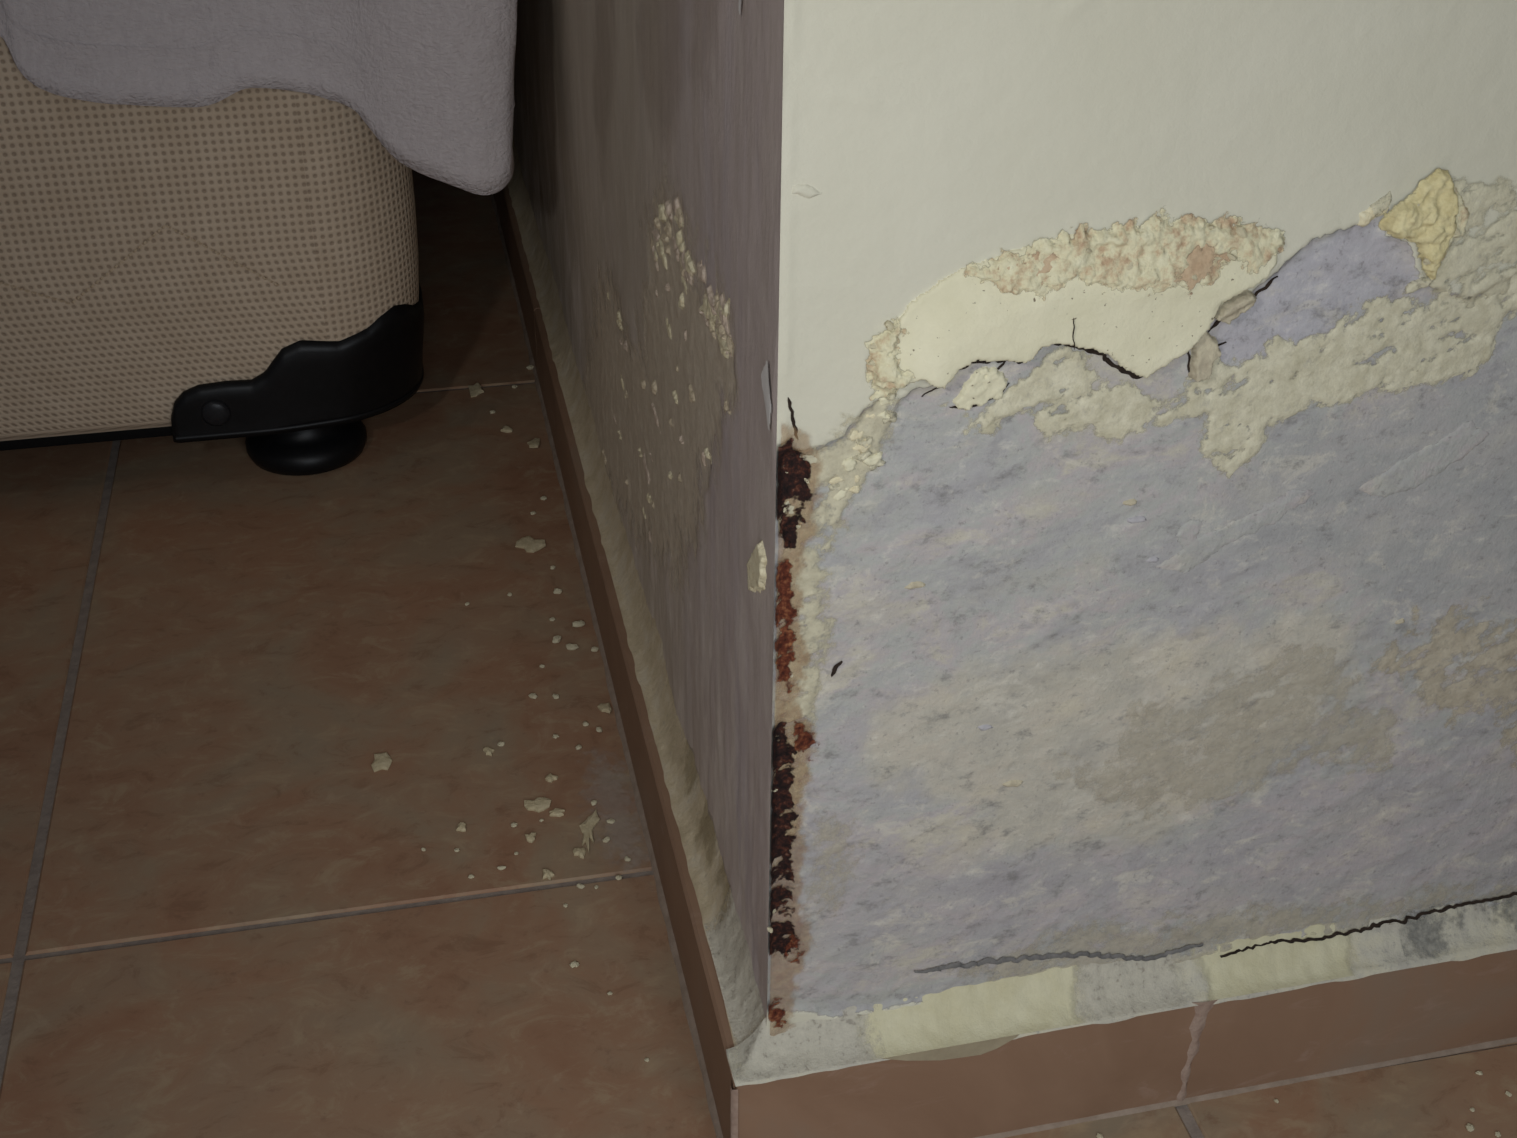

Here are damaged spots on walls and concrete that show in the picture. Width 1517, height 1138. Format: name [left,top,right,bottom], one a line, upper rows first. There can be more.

peeling [583,179,736,581]
corrosion [775,438,816,693]
peeling [746,168,1517,1017]
corrosion [768,998,786,1028]
corrosion [767,722,819,964]
crack [914,892,1517,973]